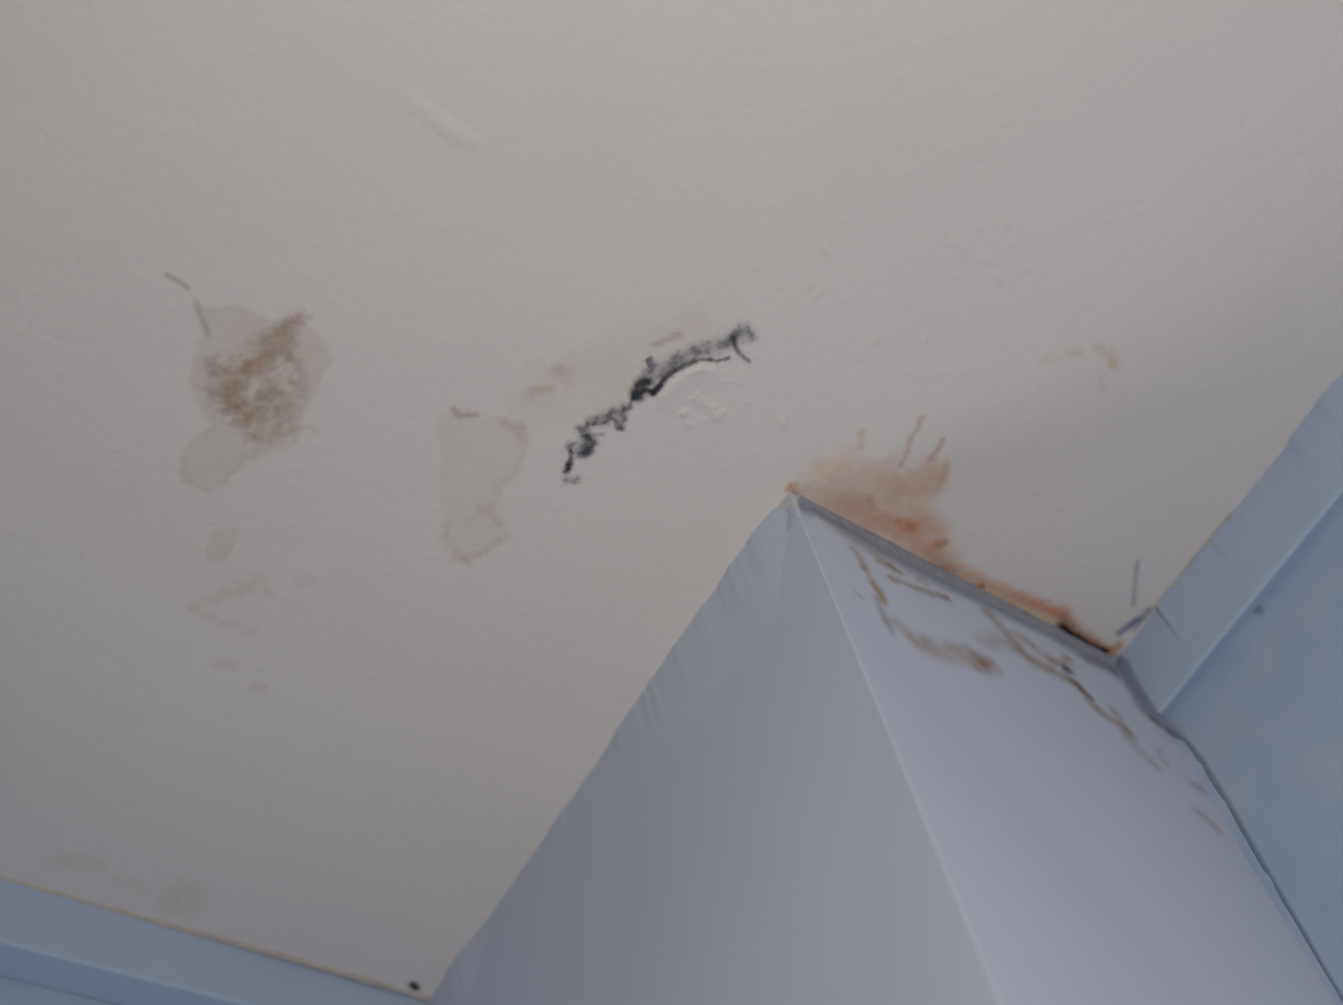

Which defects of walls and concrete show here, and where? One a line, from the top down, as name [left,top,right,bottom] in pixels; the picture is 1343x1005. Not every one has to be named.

crack [564,329,753,473]